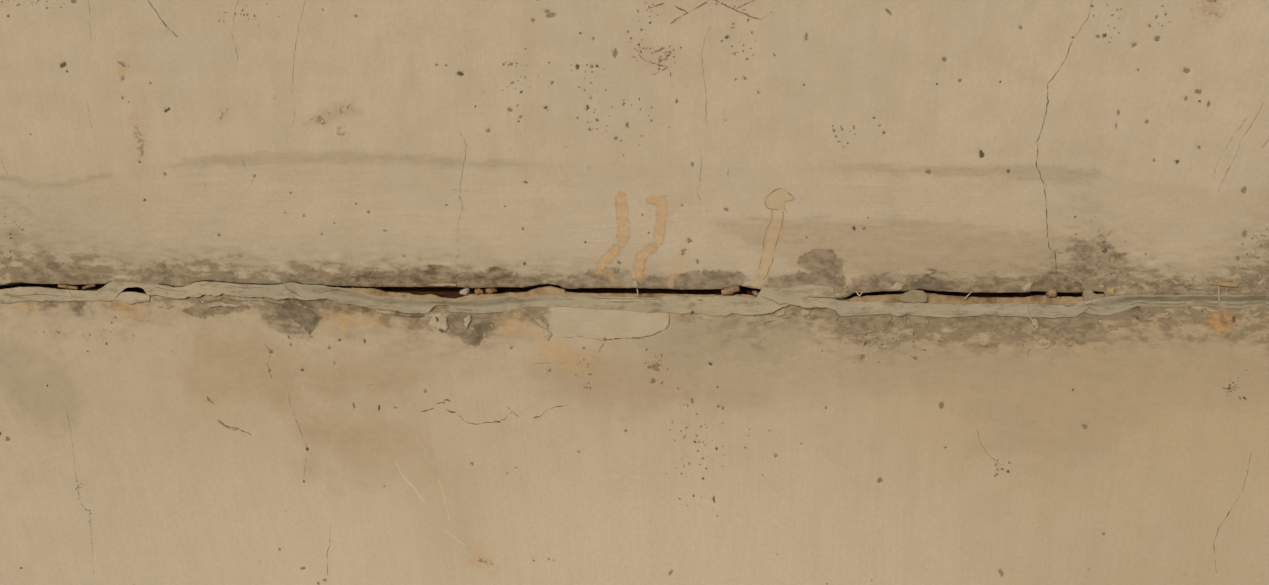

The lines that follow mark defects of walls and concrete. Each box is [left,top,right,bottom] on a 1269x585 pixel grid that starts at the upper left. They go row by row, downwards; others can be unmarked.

crack [843,3,1102,299]
spalling [38,300,86,315]
crack [0,283,151,297]
spalling [136,258,197,287]
spalling [152,255,749,348]
crack [327,134,791,351]
corrosion [593,190,691,289]
corrosion [753,186,795,289]
damp [706,212,1061,282]
crack [421,399,561,425]